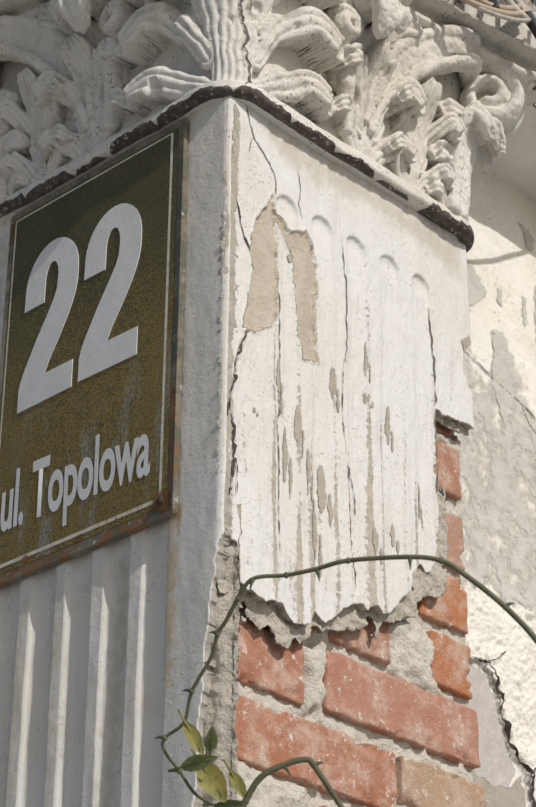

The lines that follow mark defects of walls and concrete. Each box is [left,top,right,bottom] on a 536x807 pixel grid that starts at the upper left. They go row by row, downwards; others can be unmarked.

crack [239,0,252,83]
spalling [0,85,408,523]
crack [236,199,250,249]
crack [246,104,277,192]
peeling [418,203,487,313]
peeling [522,285,536,327]
crack [227,331,248,495]
crack [275,377,283,495]
peeling [283,406,333,577]
spalling [238,485,449,649]
peeling [435,328,536,620]
crack [470,651,536,807]